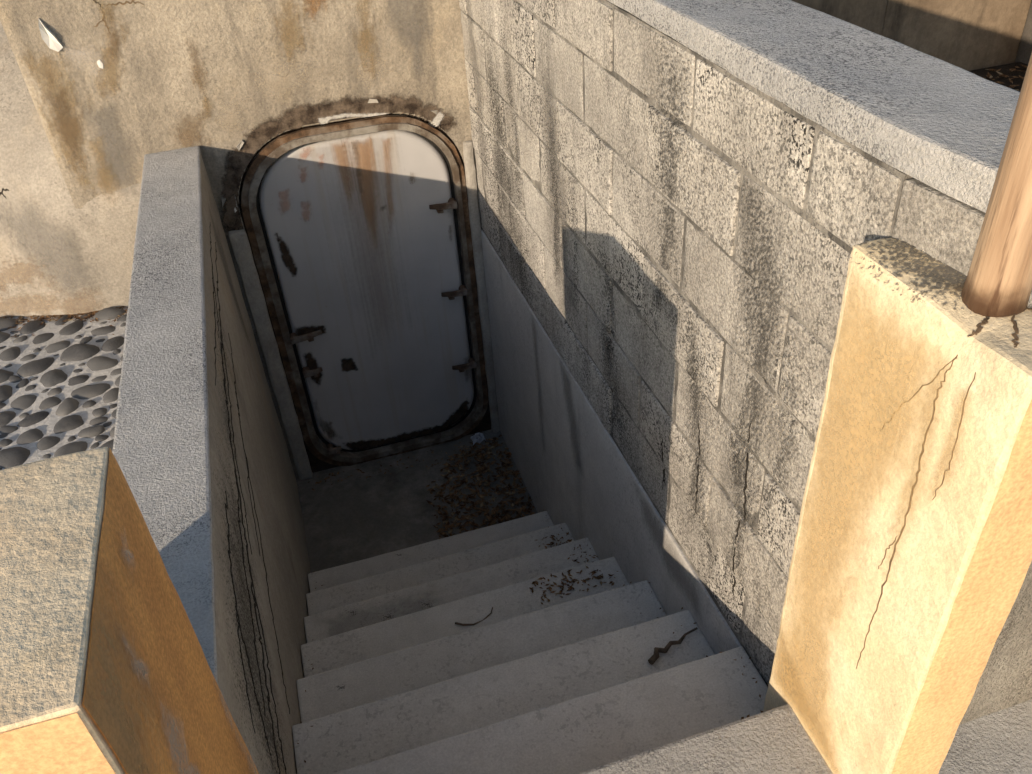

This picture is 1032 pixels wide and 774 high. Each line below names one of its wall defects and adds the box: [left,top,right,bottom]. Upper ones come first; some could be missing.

crack [93,0,144,32]
peeling [38,18,63,52]
corrosion [275,233,297,275]
corrosion [295,326,326,336]
corrosion [304,353,322,385]
corrosion [341,358,358,372]
corrosion [346,401,469,451]
crack [210,224,290,774]
crack [856,308,1032,669]